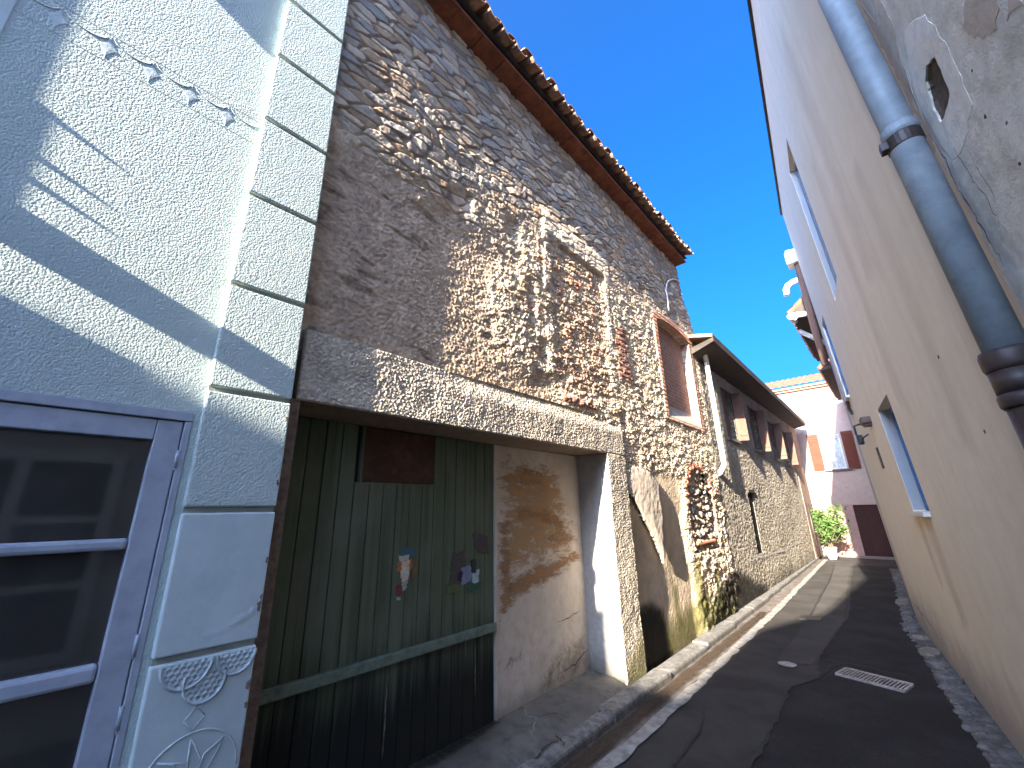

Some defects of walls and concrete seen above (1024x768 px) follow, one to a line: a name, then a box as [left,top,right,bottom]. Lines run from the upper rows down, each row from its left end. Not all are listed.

spalling [858,0,973,160]
crack [928,133,1004,265]
water stain [640,586,681,673]
water stain [562,612,767,768]